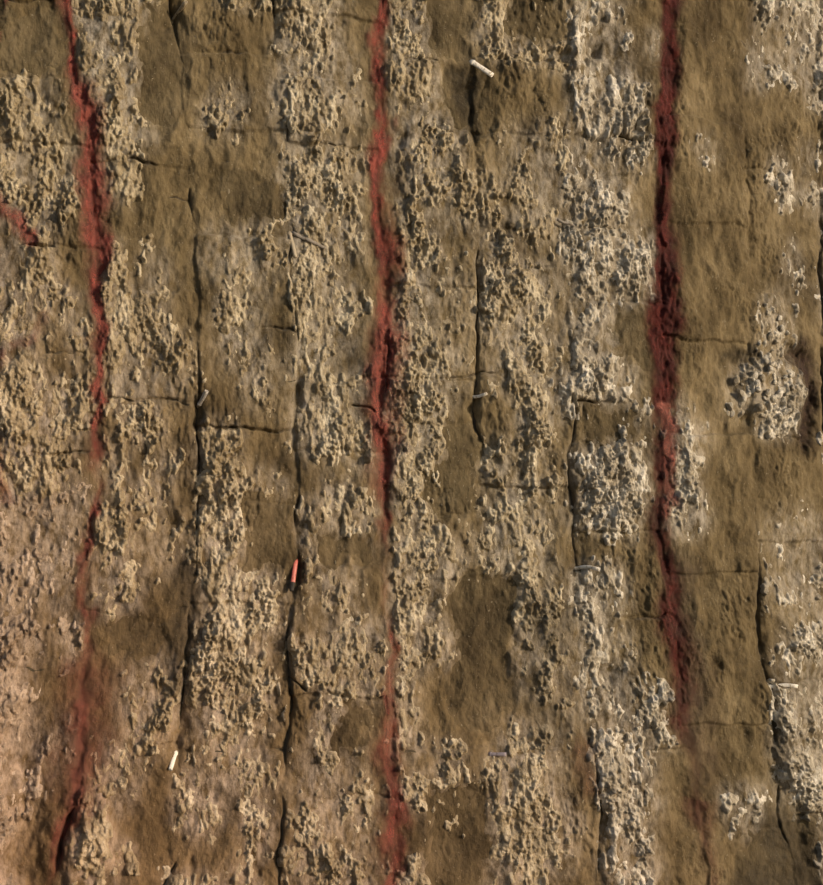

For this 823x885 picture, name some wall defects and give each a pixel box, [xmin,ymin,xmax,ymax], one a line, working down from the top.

crack [270,319,298,337]
crack [172,341,201,545]
crack [220,426,284,434]
crack [292,485,300,523]
crack [567,399,601,577]
crack [179,607,189,728]
crack [274,626,306,763]
crack [275,805,286,885]
crack [588,738,603,873]